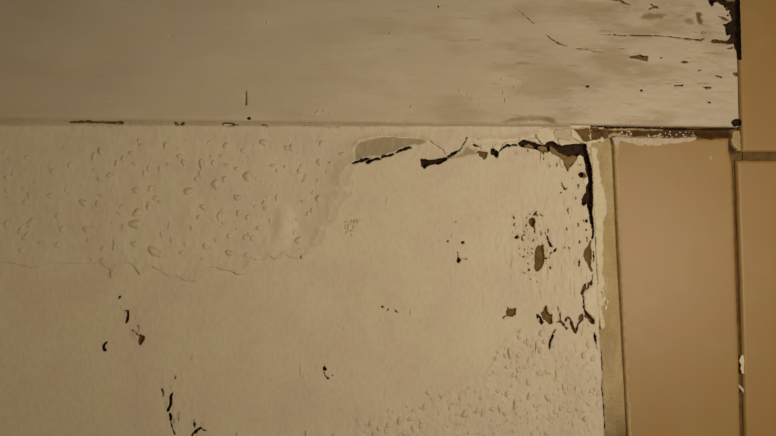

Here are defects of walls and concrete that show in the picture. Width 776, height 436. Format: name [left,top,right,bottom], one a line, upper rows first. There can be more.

spalling [708,0,742,60]
peeling [460,127,608,168]
peeling [577,155,588,186]
peeling [512,211,554,277]
spalling [584,241,595,272]
spalling [536,306,570,333]
peeling [581,286,597,336]